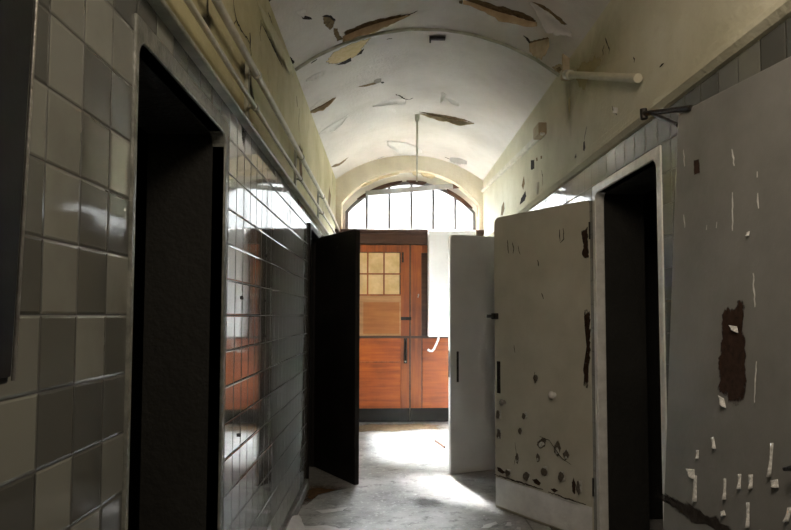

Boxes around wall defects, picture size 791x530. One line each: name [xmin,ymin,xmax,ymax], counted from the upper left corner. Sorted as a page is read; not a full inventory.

crack [233,0,272,51]
peeling [306,11,417,82]
peeling [459,0,572,60]
peeling [310,97,336,113]
peeling [420,112,474,126]